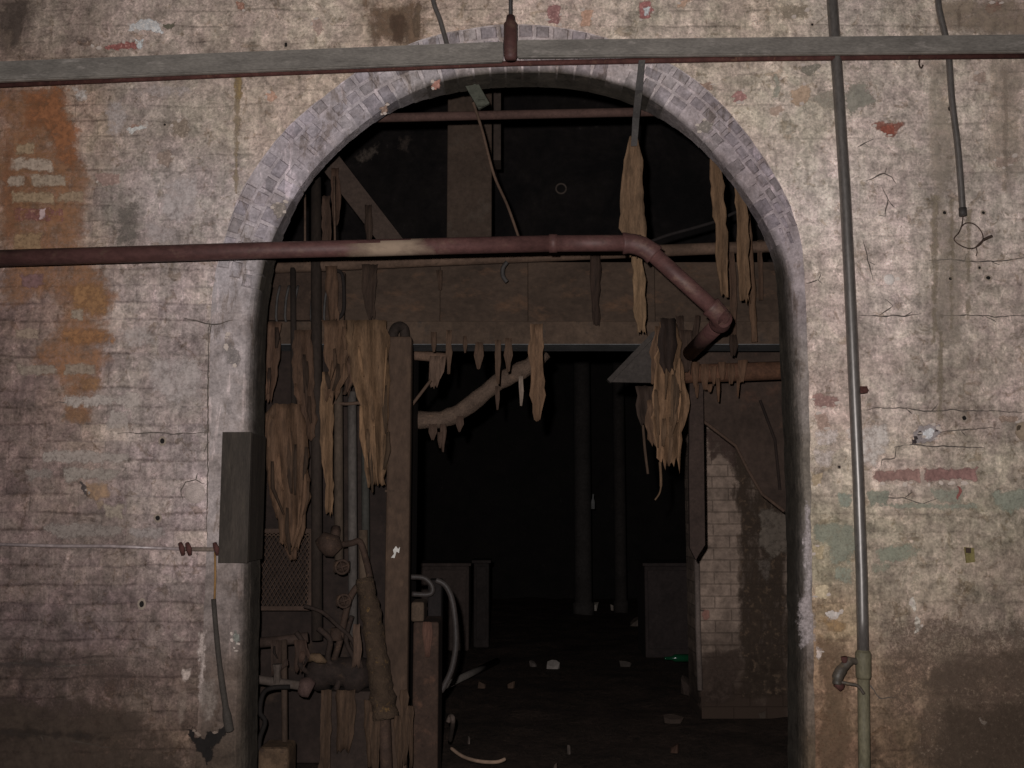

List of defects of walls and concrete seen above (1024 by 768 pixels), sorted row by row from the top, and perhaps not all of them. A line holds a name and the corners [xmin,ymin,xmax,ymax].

leakage [363,0,422,44]
corrosion [0,86,87,249]
crack [866,168,896,216]
corrosion [8,264,116,422]
spalling [810,393,978,510]
crack [868,404,1022,465]
leakage [700,429,849,766]
spalling [188,727,226,765]
leakage [889,619,1024,768]